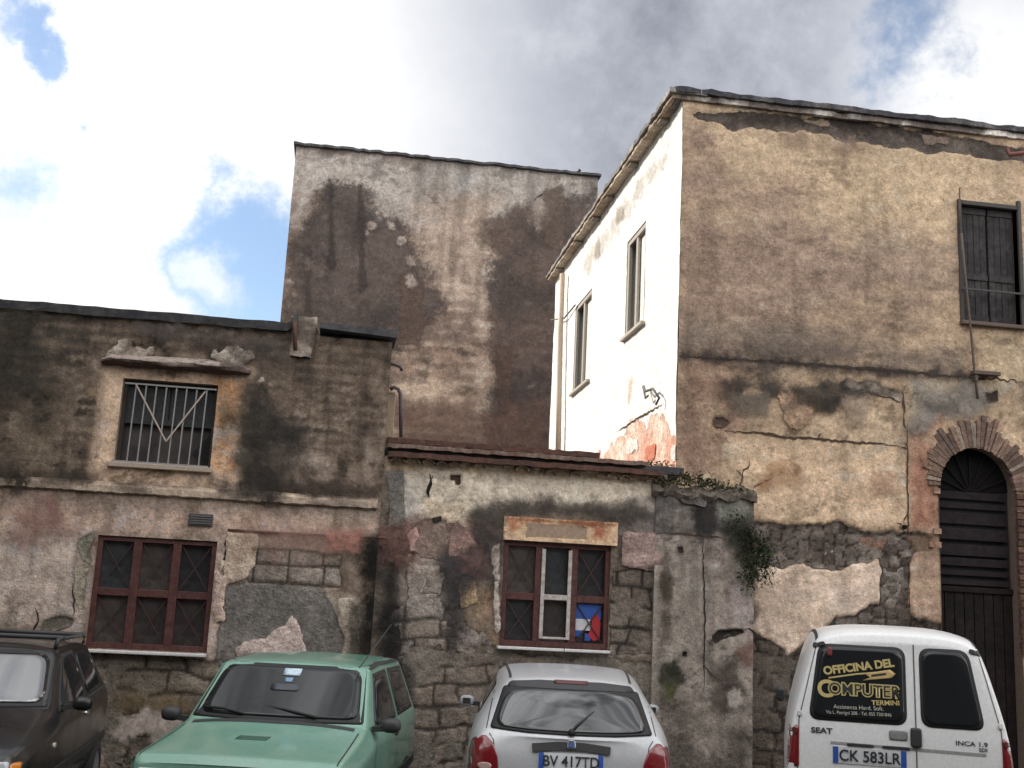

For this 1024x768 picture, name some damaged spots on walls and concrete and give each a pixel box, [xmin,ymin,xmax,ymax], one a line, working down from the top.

spalling [693,111,1024,163]
damp [208,384,378,504]
damp [281,179,445,354]
damp [477,176,598,449]
flaking render [477,412,676,482]
damp [722,336,882,425]
crack [679,356,1024,535]
flaking render [91,549,344,768]
crack [662,532,725,686]
flaking render [713,629,803,768]
flaking render [754,521,941,631]
crack [904,561,912,608]